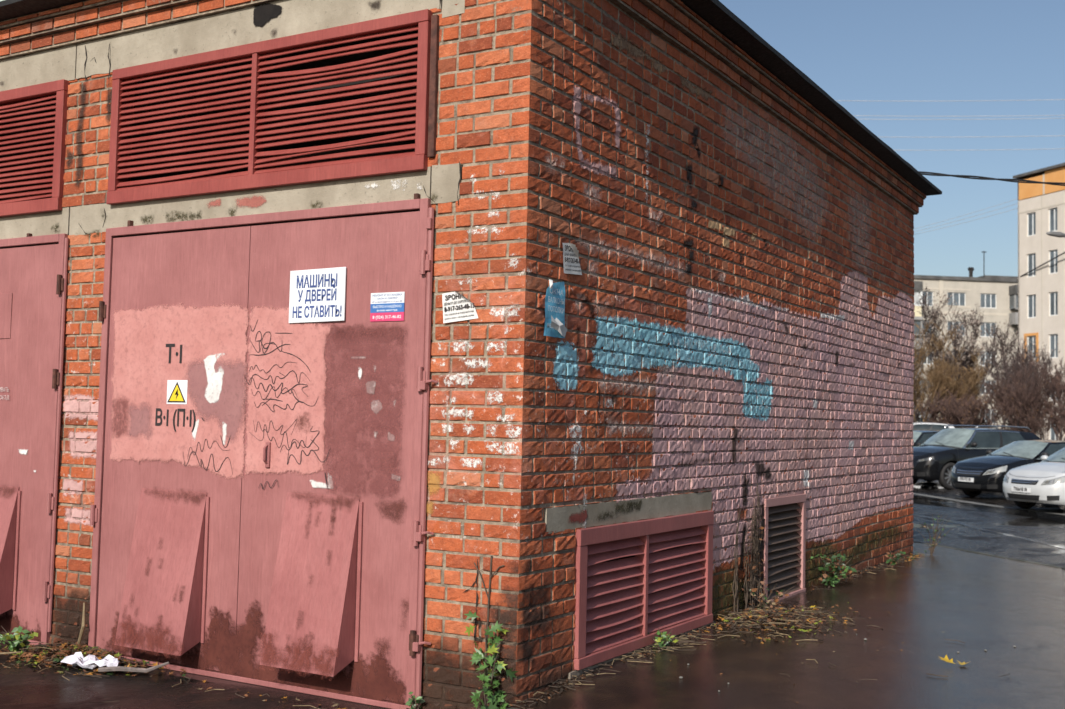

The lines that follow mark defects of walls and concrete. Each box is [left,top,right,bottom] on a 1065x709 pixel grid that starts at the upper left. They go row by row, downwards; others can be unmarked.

peeling [204,353,224,403]
corrosion [382,502,404,519]
water stain [740,503,765,612]
corrosion [105,602,407,705]
water stain [421,648,516,709]